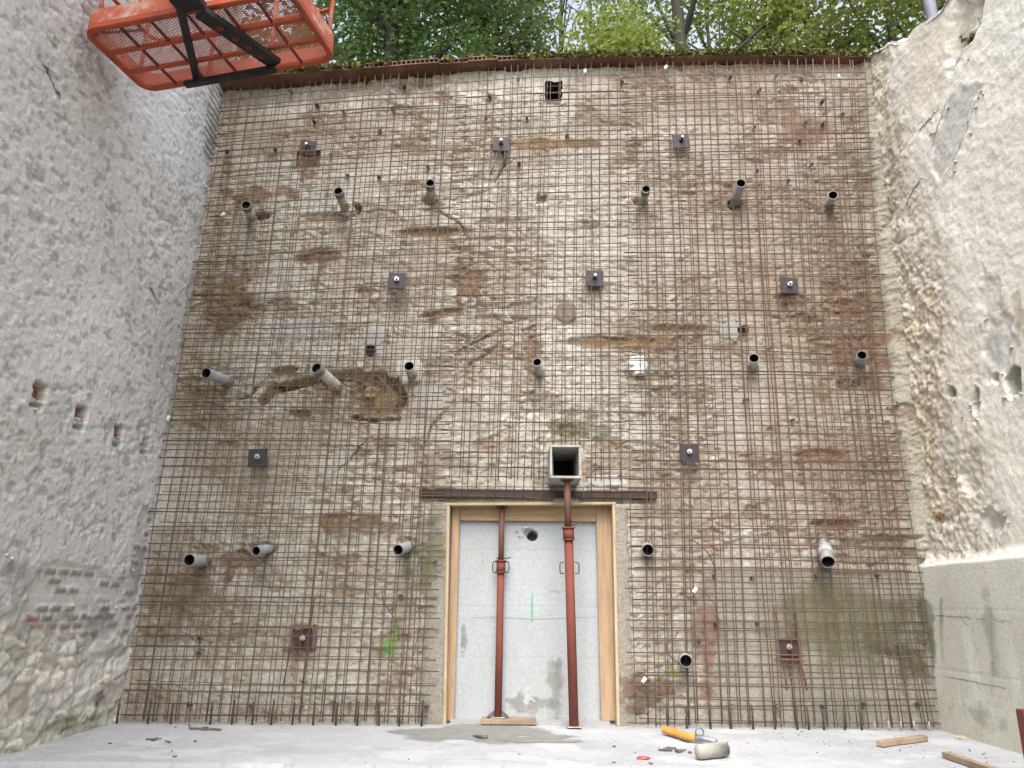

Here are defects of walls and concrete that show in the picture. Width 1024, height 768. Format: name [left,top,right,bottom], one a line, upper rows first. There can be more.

corrosion [202,273,254,336]
spalling [106,57,941,729]